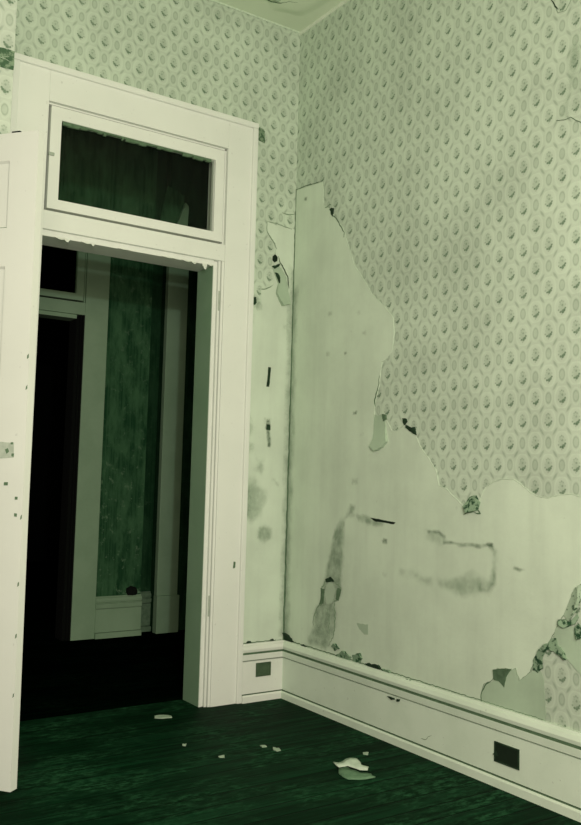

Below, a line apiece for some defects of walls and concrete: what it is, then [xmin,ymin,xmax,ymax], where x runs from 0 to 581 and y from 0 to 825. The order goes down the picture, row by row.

peeling [369,414,388,451]
peeling [463,495,480,513]
leakage [313,577,341,645]
peeling [533,585,581,675]